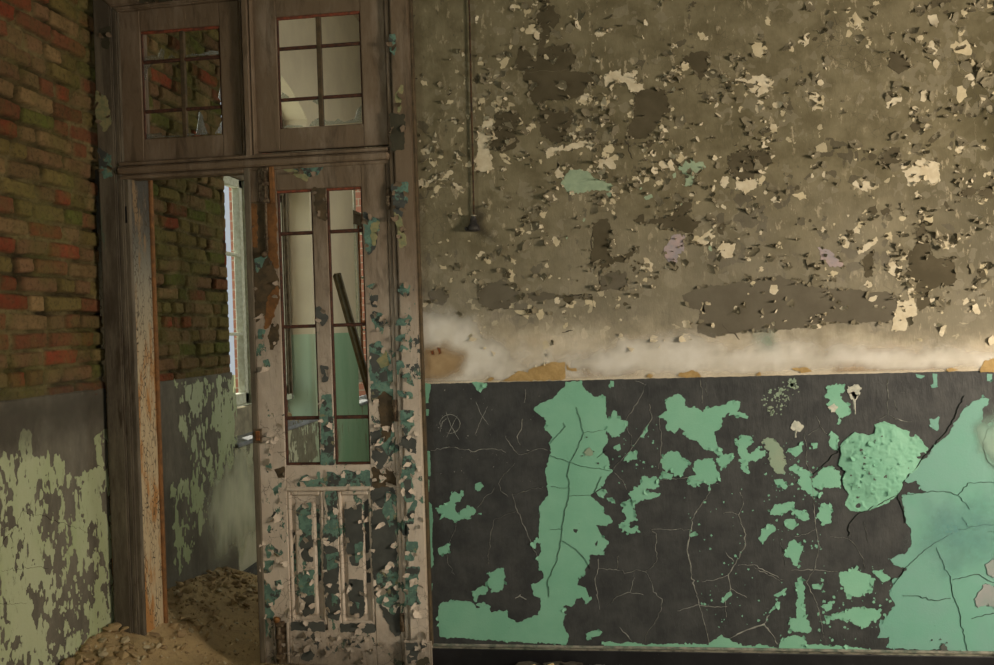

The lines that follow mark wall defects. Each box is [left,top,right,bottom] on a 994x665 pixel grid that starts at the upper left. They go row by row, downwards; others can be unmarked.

peeling [0,429,114,665]
peeling [251,200,280,367]
peeling [283,167,327,221]
peeling [170,283,484,665]
leakage [423,314,524,381]
peeling [389,0,994,342]
crack [431,381,994,651]
peeling [436,340,994,651]
leakage [565,335,994,377]